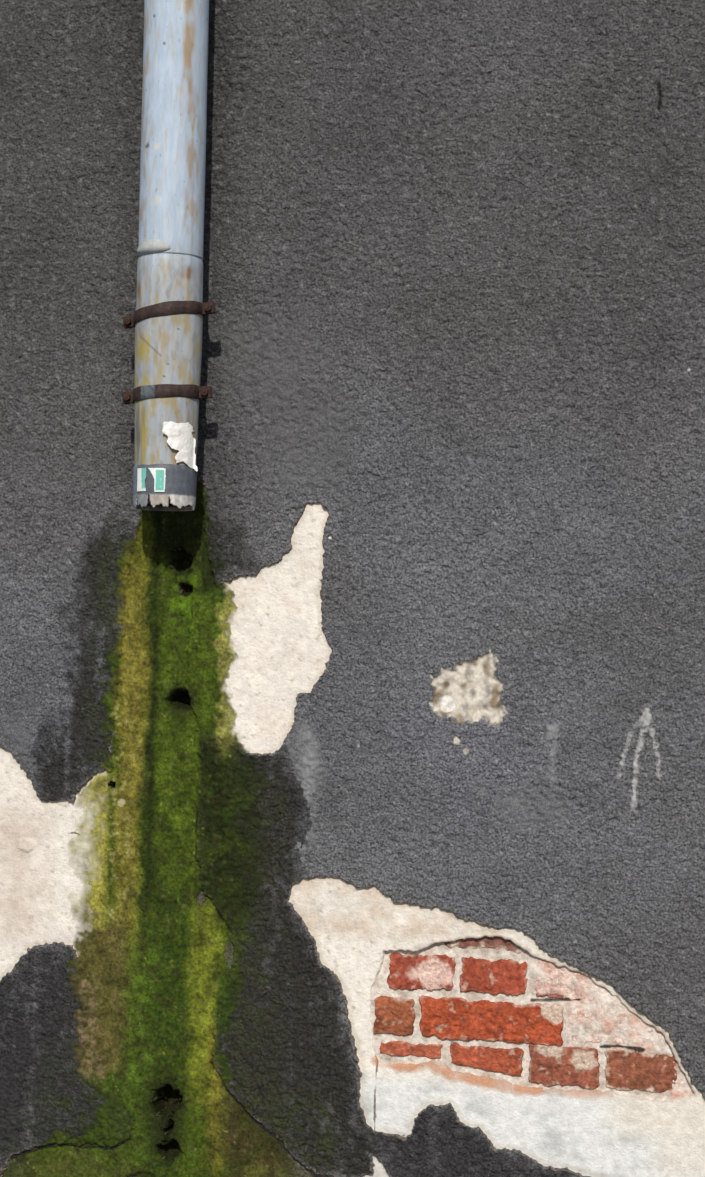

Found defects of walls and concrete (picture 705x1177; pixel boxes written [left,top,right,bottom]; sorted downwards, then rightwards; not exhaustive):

leakage [36,530,134,801]
peeling [222,503,332,754]
spalling [429,649,508,724]
peeling [0,747,126,980]
leakage [0,950,106,1164]
peeling [289,876,705,1177]